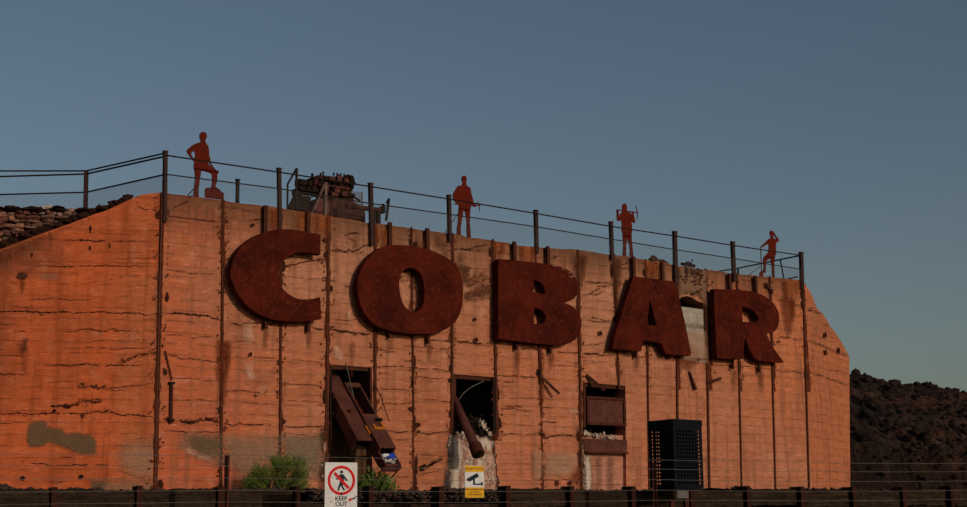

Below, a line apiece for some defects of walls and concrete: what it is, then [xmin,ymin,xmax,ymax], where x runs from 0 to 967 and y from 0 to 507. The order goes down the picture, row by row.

crack [136,194,274,222]
crack [0,231,325,484]
rust [219,342,230,395]
water stain [27,421,96,454]
peeling [458,412,503,490]